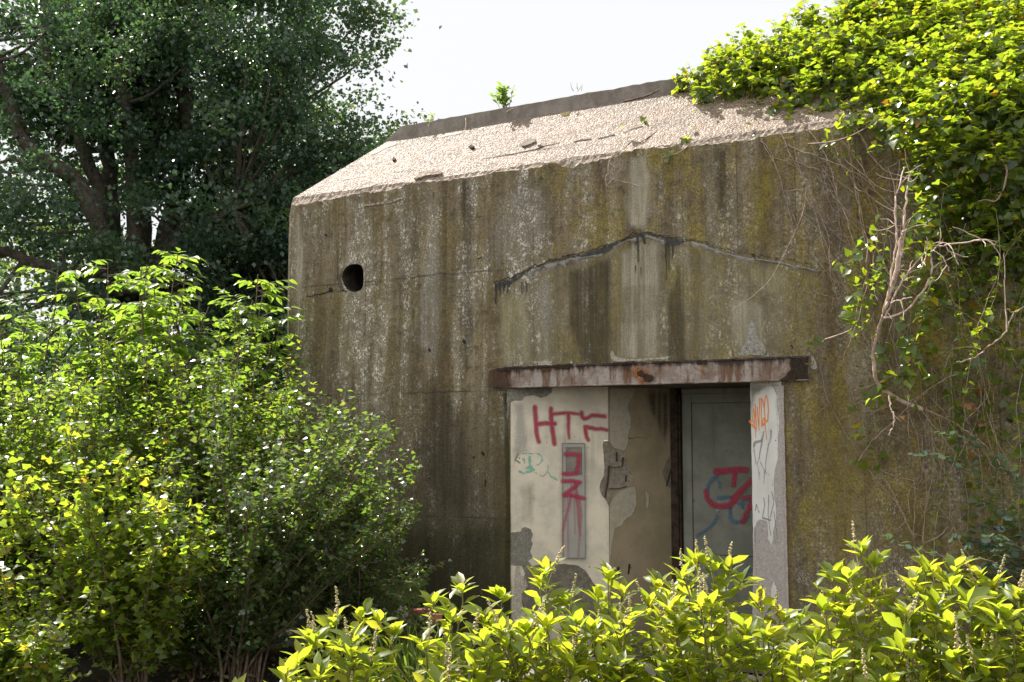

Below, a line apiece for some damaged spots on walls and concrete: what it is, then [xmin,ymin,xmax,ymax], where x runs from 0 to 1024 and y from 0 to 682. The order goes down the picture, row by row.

water stain [629,157,648,227]
water stain [621,244,658,358]
crack [494,232,820,304]
corrosion [489,363,573,388]
corrosion [613,361,662,382]
corrosion [779,357,809,381]
water stain [504,394,525,620]
peeling [600,388,649,575]
peeling [752,385,789,645]
peeling [511,527,613,631]